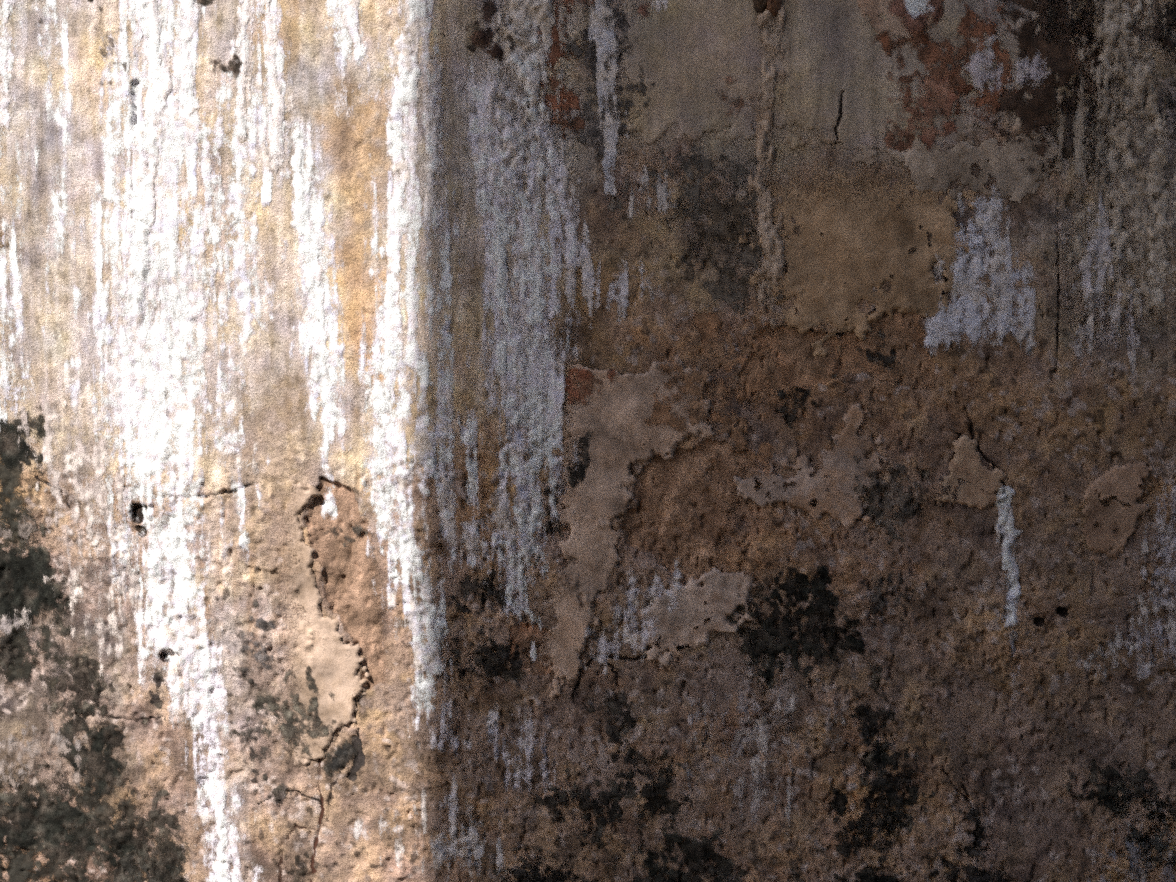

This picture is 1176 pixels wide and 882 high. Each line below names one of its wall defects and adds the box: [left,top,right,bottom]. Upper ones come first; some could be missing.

rust [531,0,595,138]
rust [873,0,1017,151]
leakage [924,185,1038,356]
leakage [963,0,1176,374]
leakage [0,0,786,882]
peeling [509,358,889,700]
leakage [995,486,1022,698]
leakage [1083,481,1176,680]
crack [257,759,345,882]
leakage [687,565,935,882]
leakage [930,805,1012,882]
leakage [1066,759,1176,882]